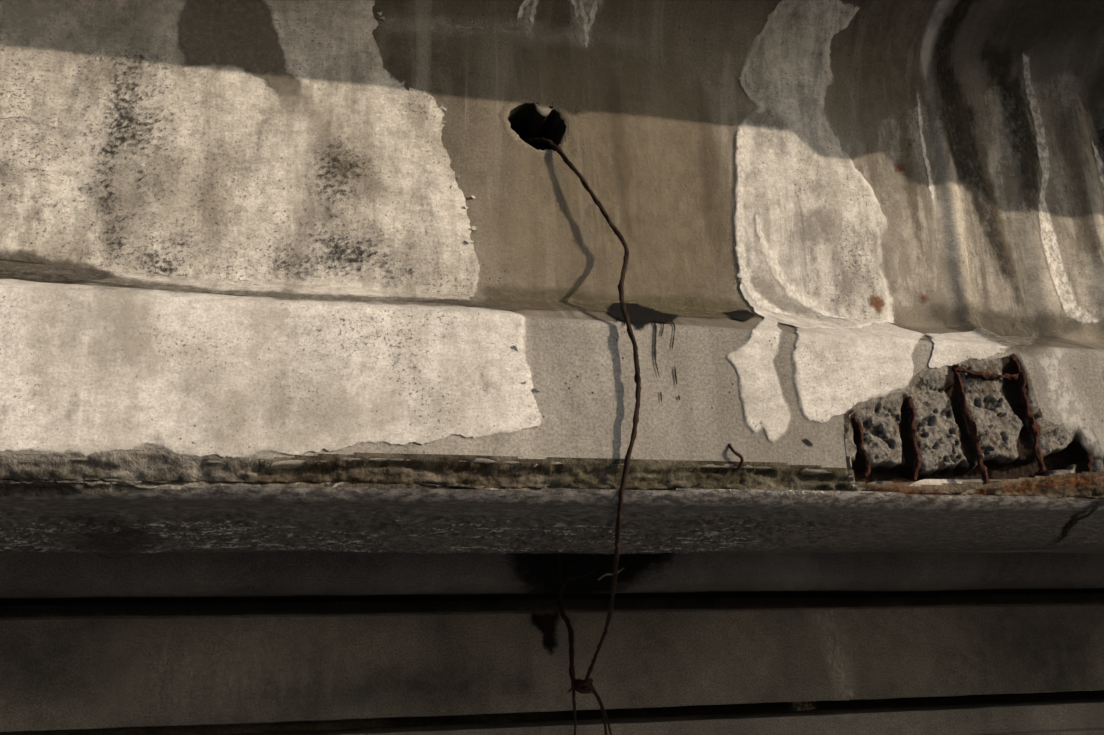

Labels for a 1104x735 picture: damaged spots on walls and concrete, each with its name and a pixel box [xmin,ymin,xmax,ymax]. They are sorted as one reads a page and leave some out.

water stain [178,0,309,106]
water stain [518,0,538,31]
water stain [571,0,603,47]
water stain [0,49,523,367]
peeling [0,0,1104,499]
water stain [525,64,708,296]
water stain [722,0,1104,329]
water stain [608,303,678,378]
crack [1049,498,1104,545]